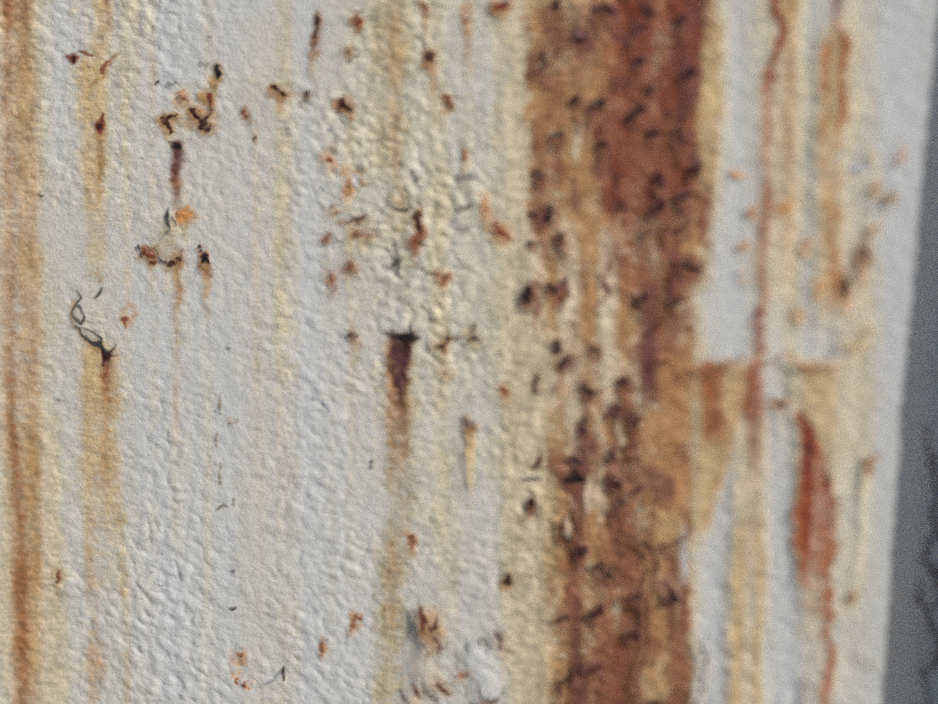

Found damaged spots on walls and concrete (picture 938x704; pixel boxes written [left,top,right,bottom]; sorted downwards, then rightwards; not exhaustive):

corrosion [0,0,68,704]
corrosion [167,206,194,235]
corrosion [159,64,223,196]
corrosion [198,244,212,295]
corrosion [384,325,420,428]
corrosion [492,0,857,704]
crack [627,493,709,704]
crack [917,428,938,704]